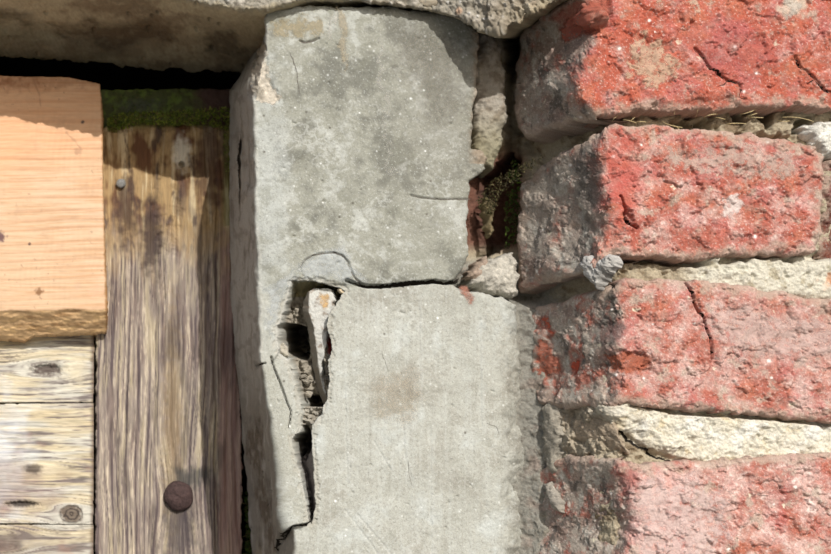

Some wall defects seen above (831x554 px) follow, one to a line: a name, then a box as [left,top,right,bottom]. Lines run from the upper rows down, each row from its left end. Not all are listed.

crack [694,50,744,99]
crack [794,57,828,93]
crack [235,138,243,203]
crack [410,193,469,201]
crack [300,252,459,289]
crack [685,284,713,354]
spalling [299,288,344,422]
crack [618,430,670,461]